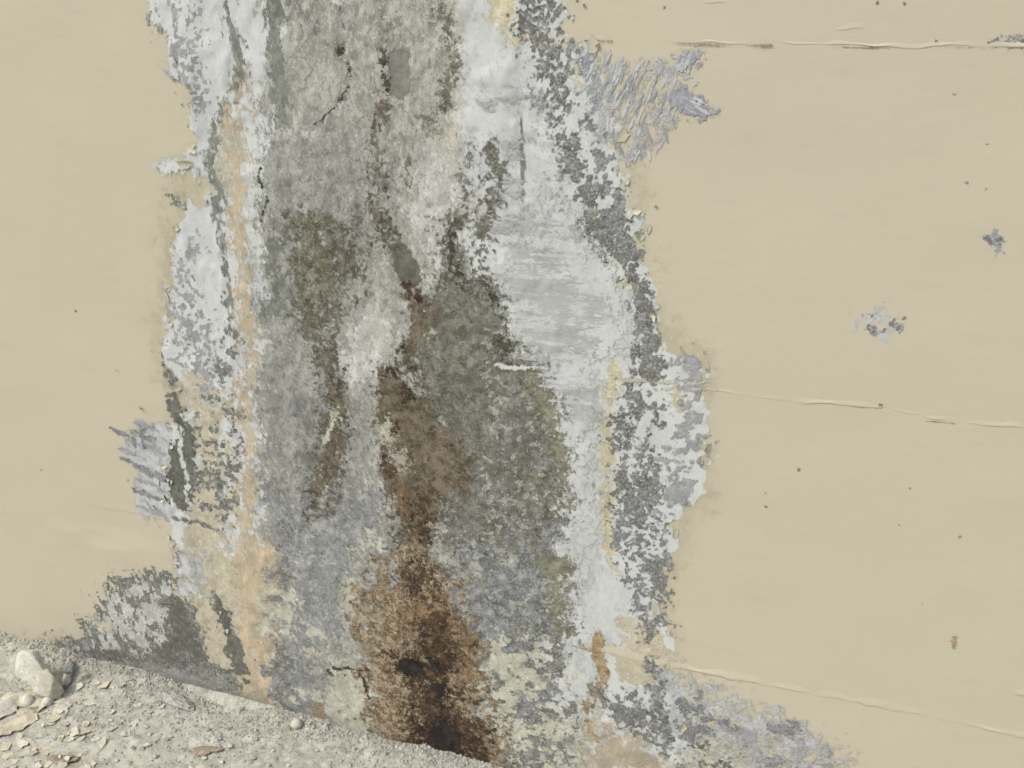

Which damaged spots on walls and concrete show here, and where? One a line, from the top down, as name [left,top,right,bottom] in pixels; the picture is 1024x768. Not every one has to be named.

crack [669,37,1024,50]
peeling [978,228,1006,259]
peeling [847,297,906,344]
water stain [246,0,624,768]
peeling [489,330,576,418]
rust [340,273,526,768]
peeling [483,544,536,578]
spalling [388,648,469,754]
peeling [464,693,496,738]